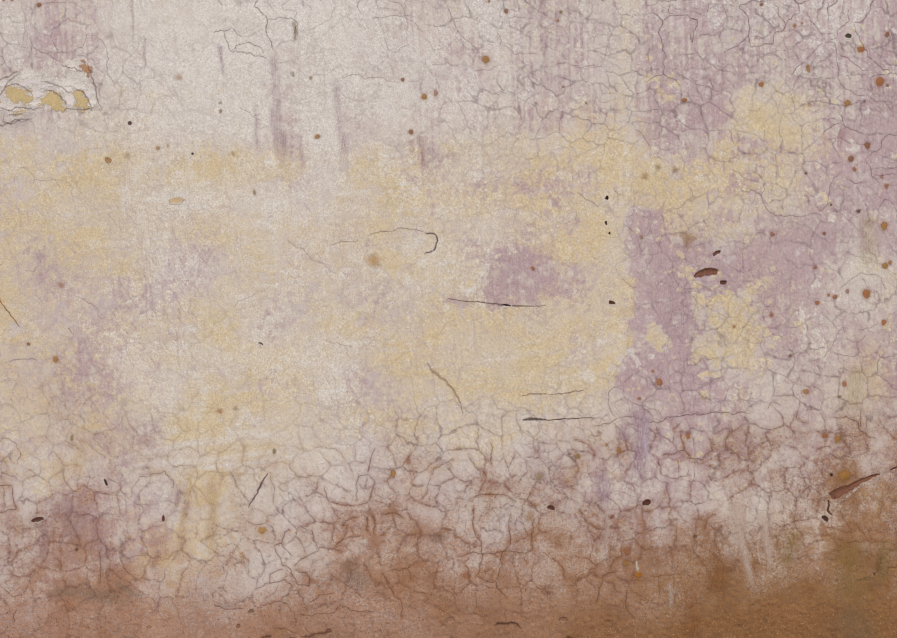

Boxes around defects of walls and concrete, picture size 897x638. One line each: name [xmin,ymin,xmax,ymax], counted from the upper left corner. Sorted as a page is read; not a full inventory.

peeling [0,59,103,129]
spalling [694,250,726,290]
spalling [821,473,880,522]